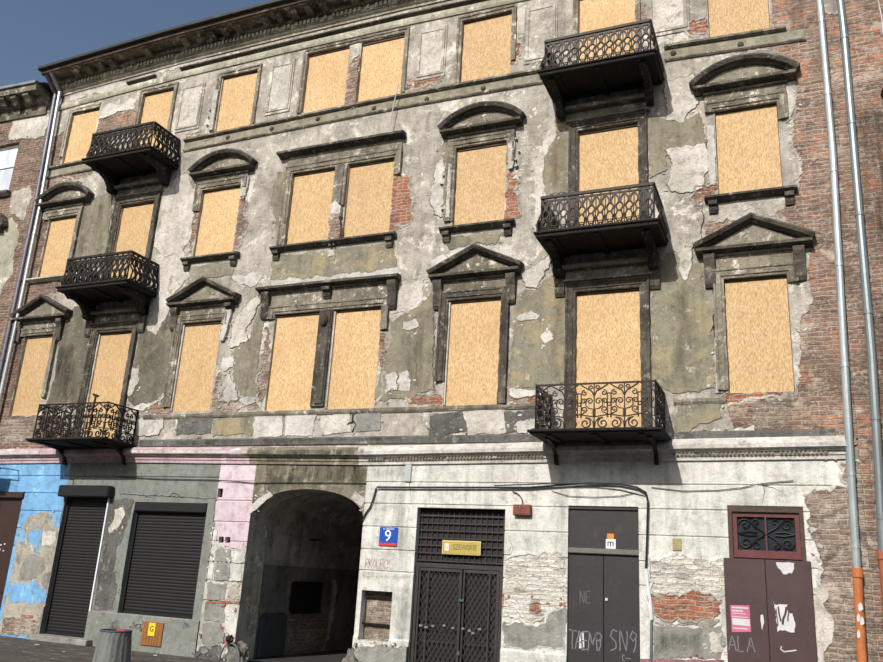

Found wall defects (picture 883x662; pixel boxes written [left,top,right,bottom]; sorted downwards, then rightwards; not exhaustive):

flaking render [7,107,65,166]
flaking render [426,150,451,218]
flaking render [531,110,560,232]
flaking render [662,73,700,123]
flaking render [663,125,718,209]
spalling [704,0,857,446]
spalling [0,171,93,449]
spalling [127,267,402,439]
peeling [0,510,62,636]
flaking render [182,527,245,661]
spalling [502,547,567,653]
spalling [640,551,726,662]